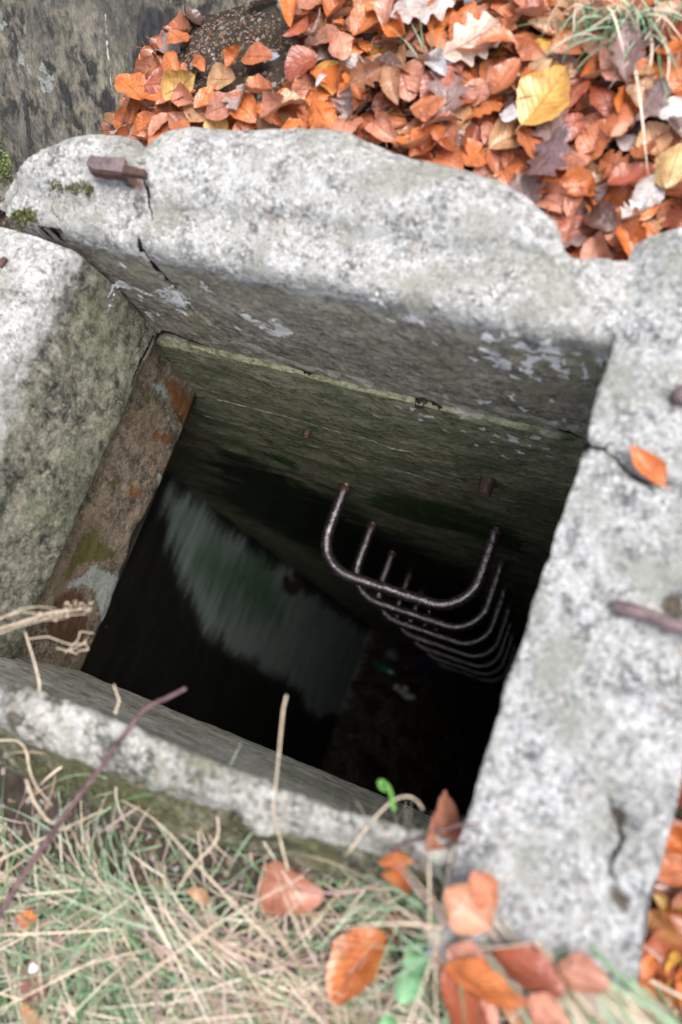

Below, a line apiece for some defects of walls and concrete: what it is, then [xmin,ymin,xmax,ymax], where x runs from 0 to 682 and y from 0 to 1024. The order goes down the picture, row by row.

crack [130,180,245,387]
rust [166,381,192,425]
crack [415,397,443,410]